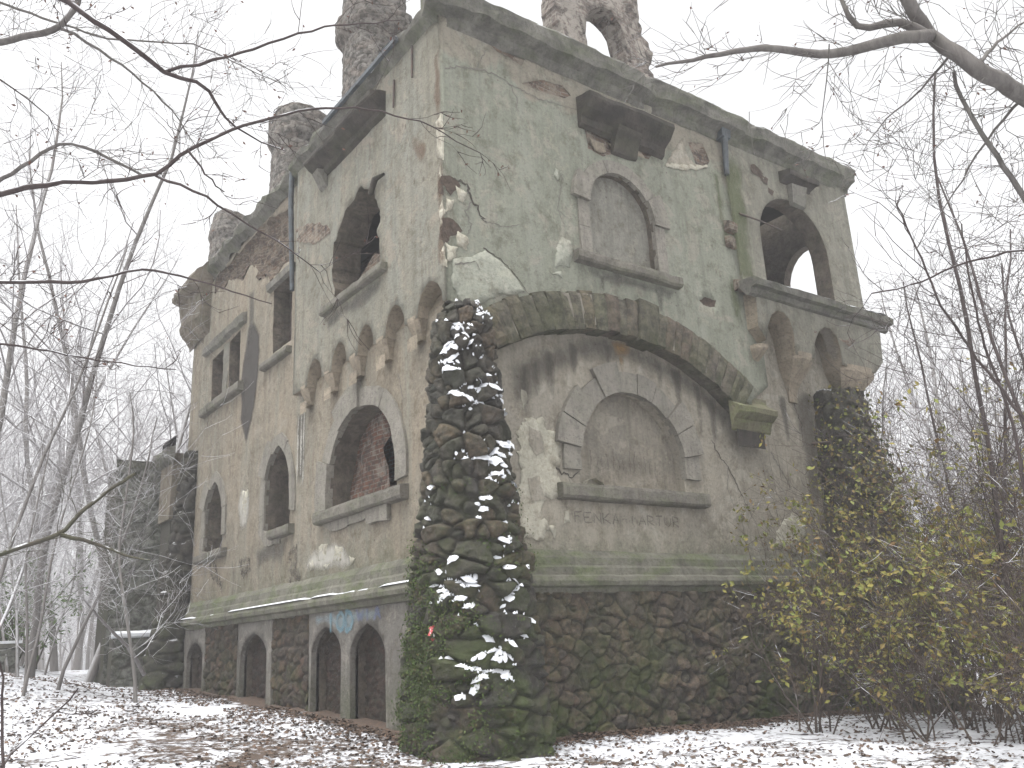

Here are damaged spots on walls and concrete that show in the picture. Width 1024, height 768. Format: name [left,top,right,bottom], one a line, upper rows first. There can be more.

spalling [522,80,570,98]
peeling [665,137,709,171]
peeling [435,67,527,303]
crack [454,178,519,234]
spalling [215,210,331,293]
peeling [551,237,573,278]
peeling [239,489,248,525]
peeling [515,389,570,541]
crack [712,441,757,525]
peeling [309,544,356,571]